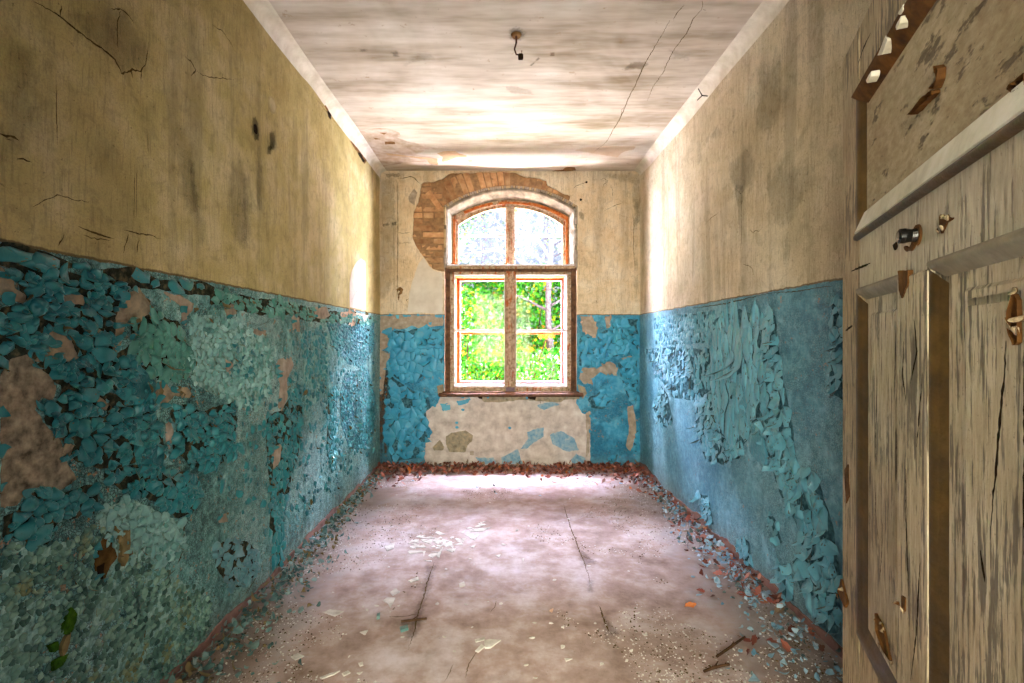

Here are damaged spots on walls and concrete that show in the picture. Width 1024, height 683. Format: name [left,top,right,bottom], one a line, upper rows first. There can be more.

crack [35,2,149,78]
crack [594,2,703,152]
flaking render [351,128,570,272]
peeling [0,242,849,683]
crack [389,563,434,650]
crack [564,507,593,581]